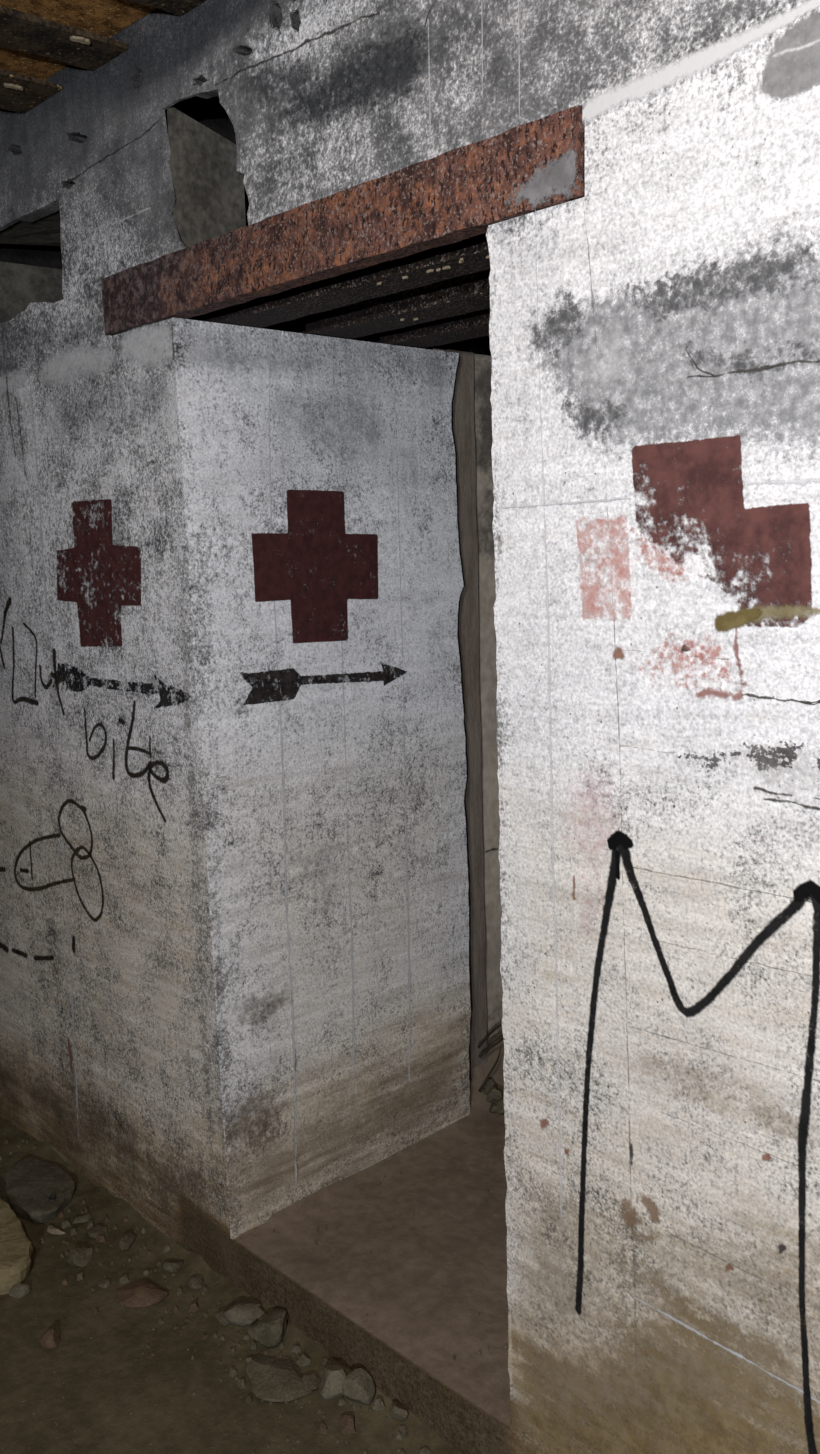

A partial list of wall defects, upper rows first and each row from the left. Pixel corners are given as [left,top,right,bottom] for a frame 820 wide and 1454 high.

crack [215,12,379,85]
crack [68,117,162,183]